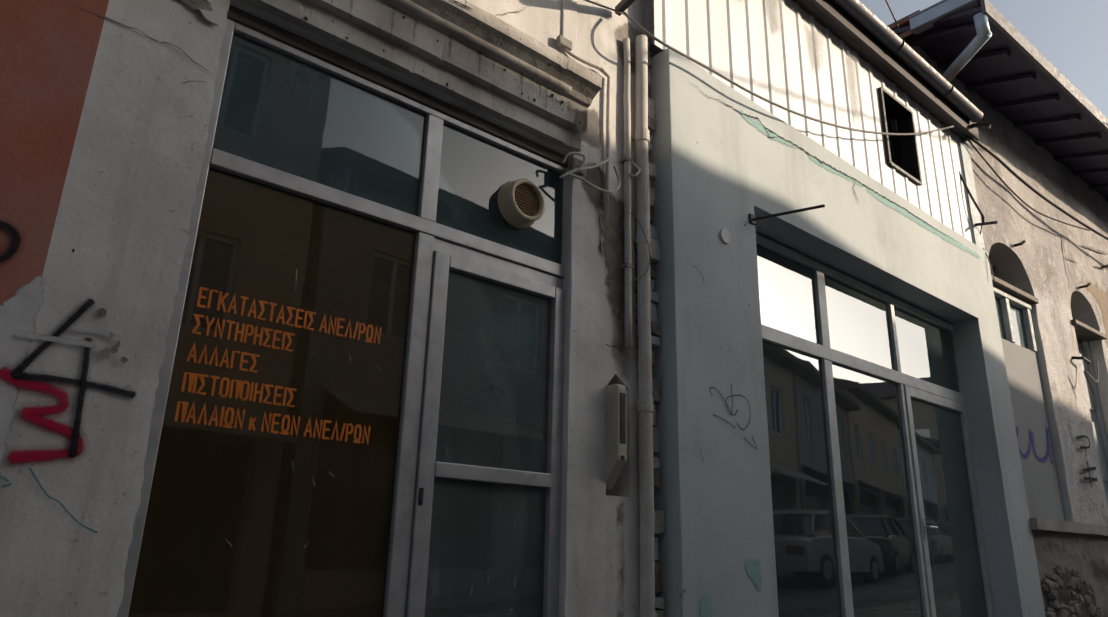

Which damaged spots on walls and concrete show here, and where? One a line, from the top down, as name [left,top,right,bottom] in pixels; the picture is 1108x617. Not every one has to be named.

crack [71,5,211,84]
spalling [180,0,218,26]
crack [689,82,958,242]
peeling [0,275,44,468]